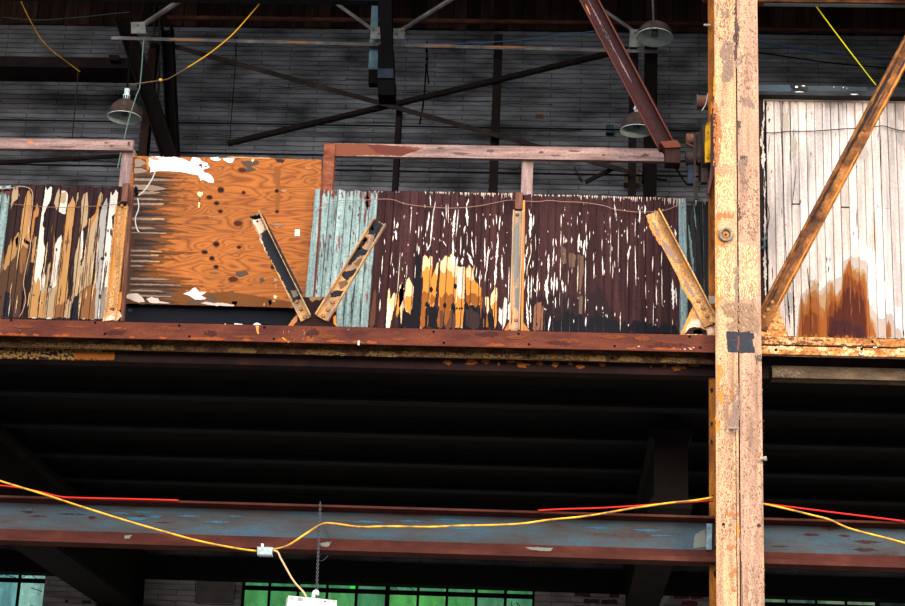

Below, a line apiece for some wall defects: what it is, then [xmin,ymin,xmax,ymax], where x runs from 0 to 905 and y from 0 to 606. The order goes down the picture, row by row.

peeling [149,156,270,183]
rust [710,76,722,187]
peeling [0,187,118,320]
rust [0,324,257,361]
peeling [127,293,168,304]
peeling [183,288,234,306]
peeling [365,198,510,330]
rust [276,285,606,369]
peeling [524,211,613,331]
rust [776,232,816,306]
rust [761,259,892,347]
rust [710,364,764,551]